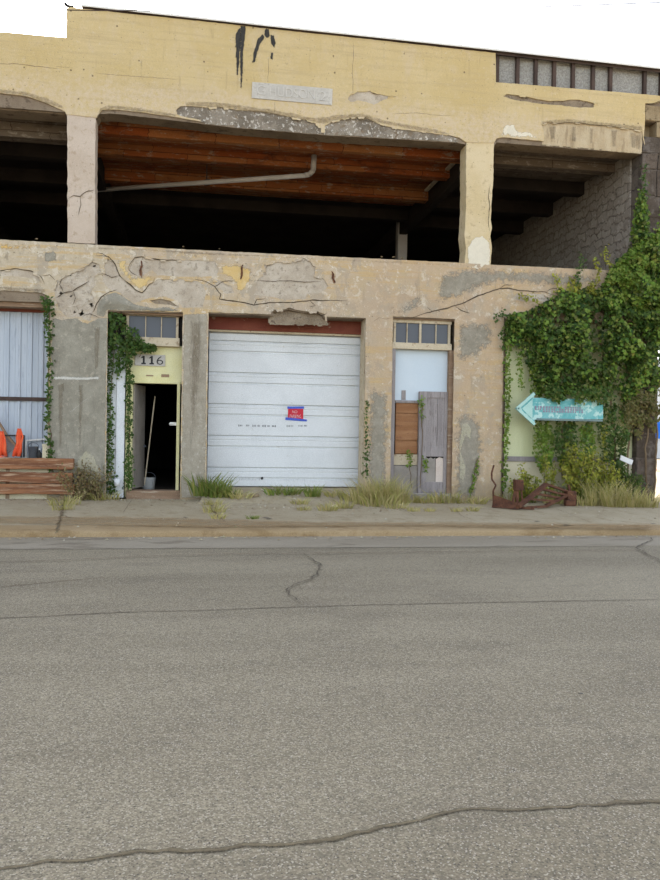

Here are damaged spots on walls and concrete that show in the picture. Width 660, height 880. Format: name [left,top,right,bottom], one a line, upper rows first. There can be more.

flaking render [348,91,394,105]
spalling [504,95,599,108]
spalling [176,106,458,142]
flaking render [542,122,645,154]
flaking render [53,256,219,321]
flaking render [254,258,328,326]
crack [411,284,556,318]